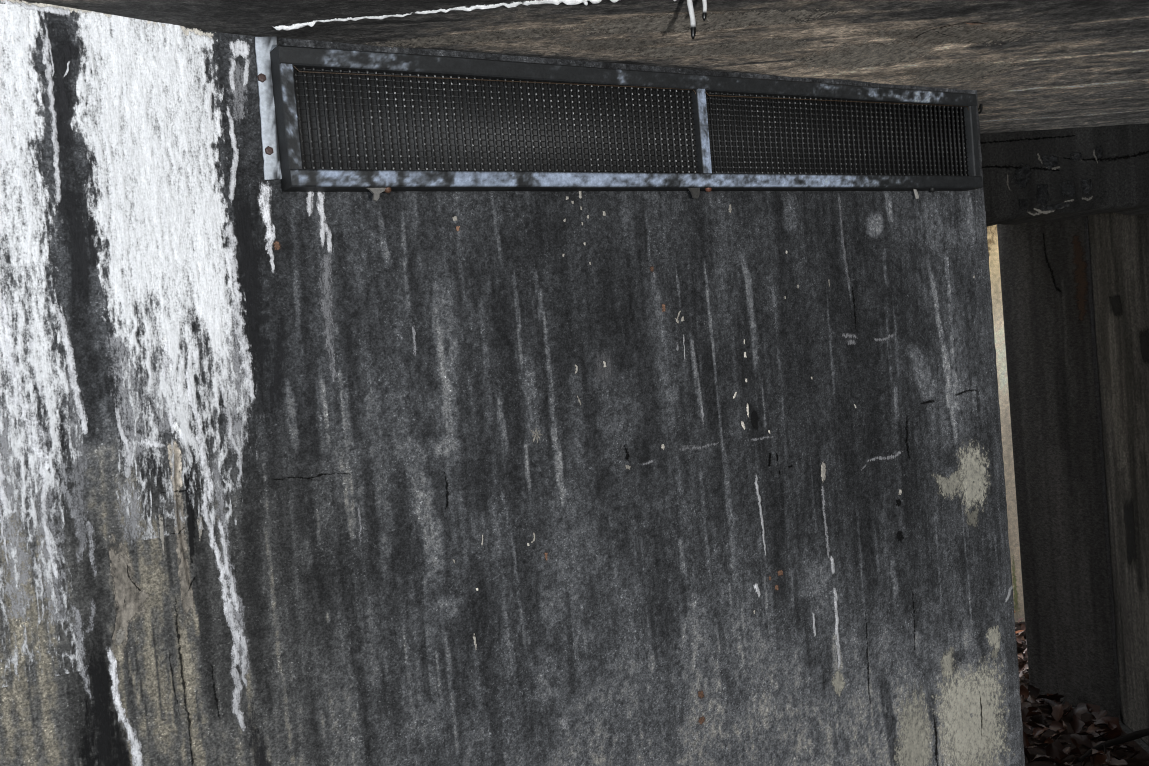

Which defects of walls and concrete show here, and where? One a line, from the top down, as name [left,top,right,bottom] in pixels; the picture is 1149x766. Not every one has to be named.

water stain [0,0,286,766]
crack [169,577,220,766]